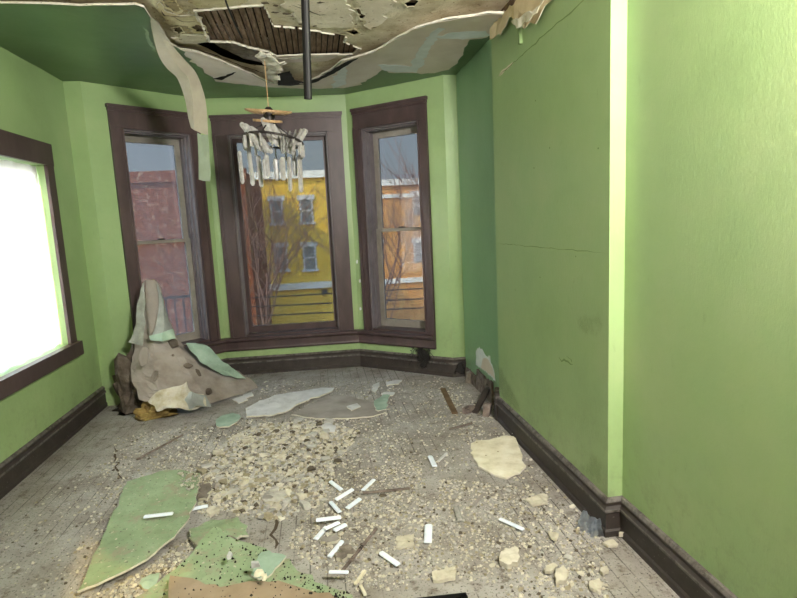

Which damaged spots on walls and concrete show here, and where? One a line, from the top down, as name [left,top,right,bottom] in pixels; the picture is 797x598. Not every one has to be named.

peeling [157,0,503,89]
crack [502,0,584,72]
peeling [476,347,495,380]